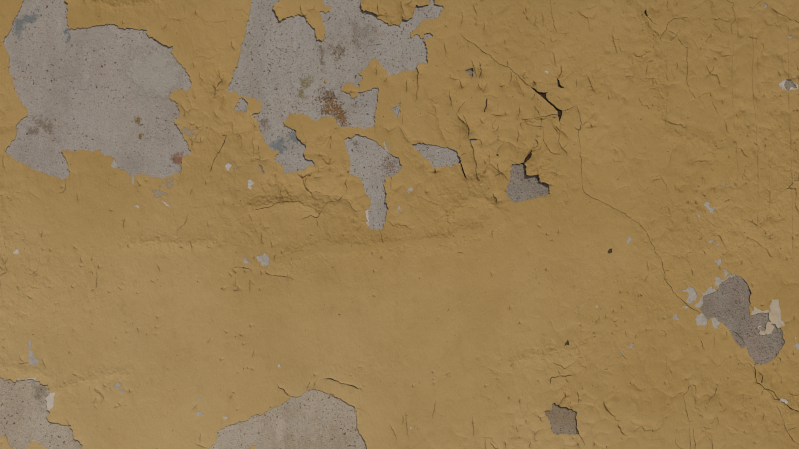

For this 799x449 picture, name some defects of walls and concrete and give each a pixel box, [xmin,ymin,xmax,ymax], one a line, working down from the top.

peeling [3,0,192,184]
peeling [228,0,582,230]
peeling [779,79,798,91]
crack [467,40,697,311]
peeling [673,259,788,405]
peeling [0,377,82,449]
peeling [209,389,367,449]
peeling [506,374,615,449]
crack [754,366,798,443]